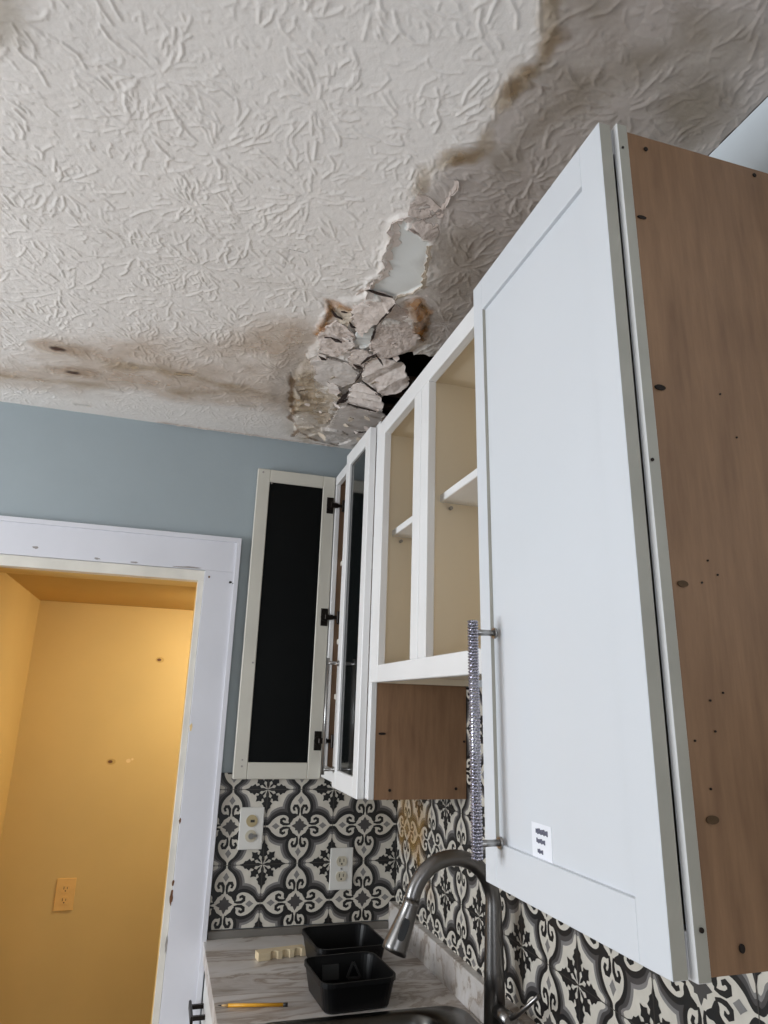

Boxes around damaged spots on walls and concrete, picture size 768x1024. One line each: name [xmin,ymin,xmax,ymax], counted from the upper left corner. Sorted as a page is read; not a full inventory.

crack [319,289,395,435]
spalling [304,180,459,445]